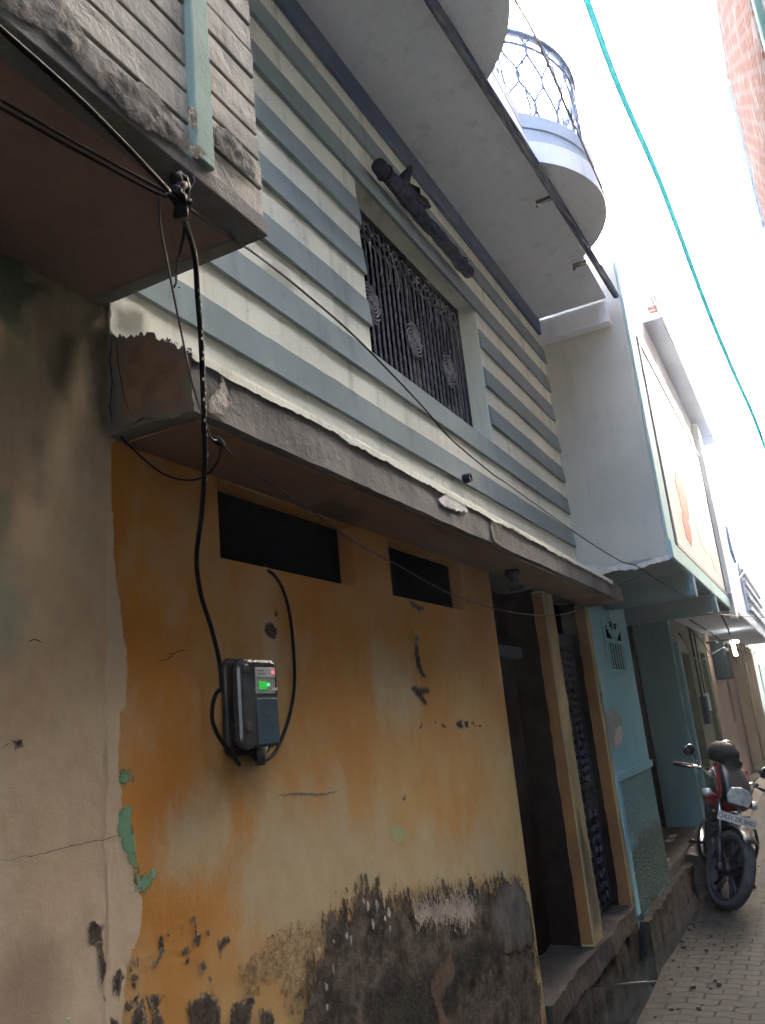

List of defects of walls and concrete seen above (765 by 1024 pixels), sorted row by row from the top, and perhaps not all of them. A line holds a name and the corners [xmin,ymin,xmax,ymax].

peeling [187,348,670,584]
spalling [411,631,429,705]
crack [1,829,135,861]
peeling [117,805,156,894]
flaking render [88,921,165,1024]
flaking render [153,916,276,1024]
damp [292,860,546,1024]